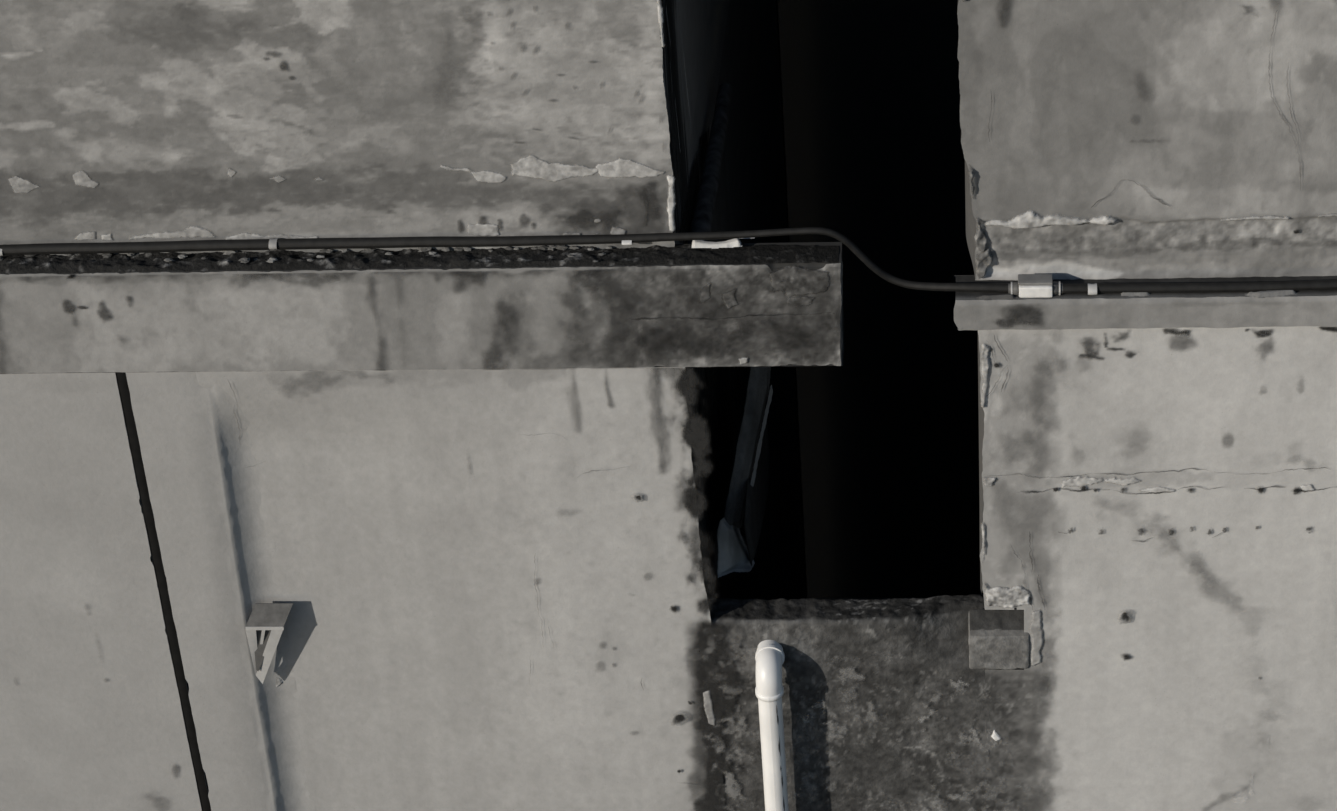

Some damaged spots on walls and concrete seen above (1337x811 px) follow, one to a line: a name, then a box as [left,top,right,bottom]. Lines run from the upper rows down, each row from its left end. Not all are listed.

flaking render [440,155,675,231]
crack [1066,467,1330,494]